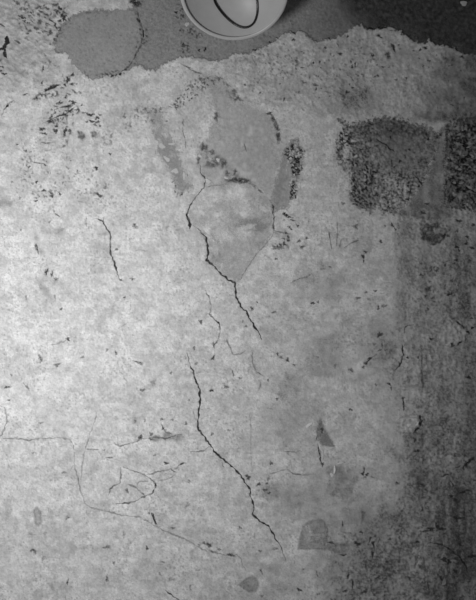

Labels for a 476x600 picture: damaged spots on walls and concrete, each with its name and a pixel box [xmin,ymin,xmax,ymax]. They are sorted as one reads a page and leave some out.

spalling [16,0,476,142]
crack [93,217,121,281]
peeling [153,116,193,194]
crack [186,172,261,338]
damp [410,147,456,247]
crack [187,354,283,552]
damp [412,328,476,465]
damp [359,464,476,600]